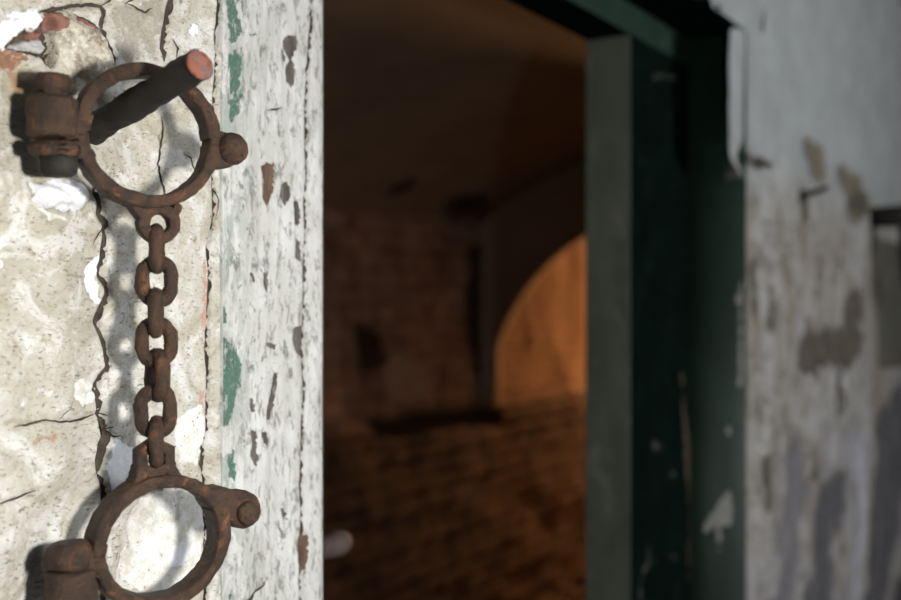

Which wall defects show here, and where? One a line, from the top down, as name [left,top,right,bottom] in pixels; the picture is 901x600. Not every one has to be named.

flaking render [0,0,163,95]
crack [39,0,179,67]
crack [212,0,220,109]
peeling [226,0,256,122]
peeling [281,35,297,87]
crack [154,120,166,194]
peeling [261,162,301,226]
crack [13,187,122,500]
crack [186,155,219,483]
flaking render [105,439,133,491]
flaking render [173,403,205,467]
peeling [250,372,279,466]